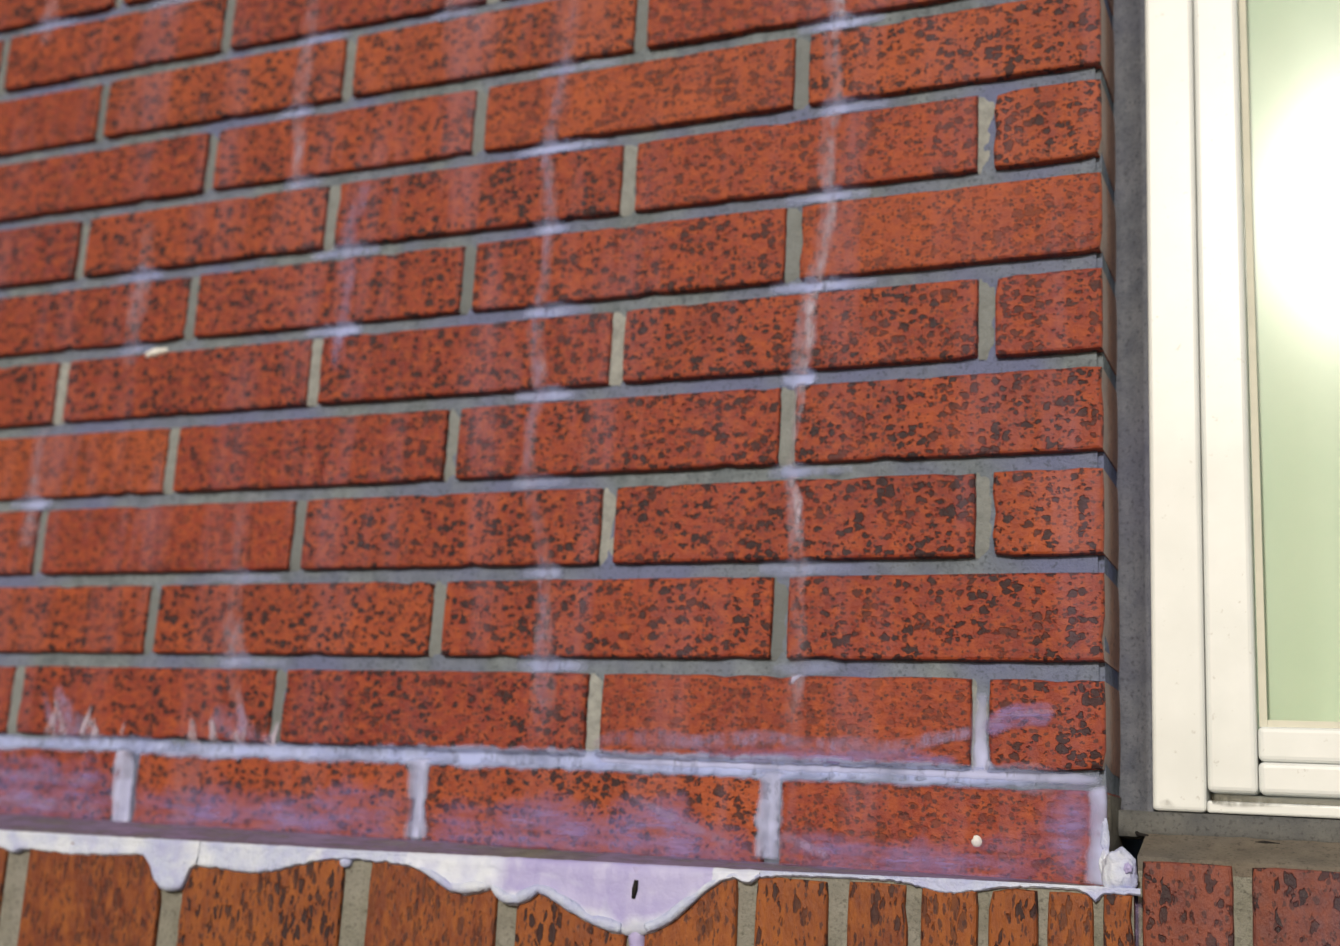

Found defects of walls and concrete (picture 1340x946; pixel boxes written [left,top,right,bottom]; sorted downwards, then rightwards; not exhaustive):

water stain [819,11,869,31]
water stain [828,103,852,115]
water stain [527,142,591,155]
water stain [807,191,850,202]
water stain [541,224,564,235]
water stain [778,279,856,315]
water stain [528,309,563,318]
water stain [784,370,815,387]
water stain [521,389,569,401]
water stain [532,660,576,670]
water stain [0,698,1141,946]